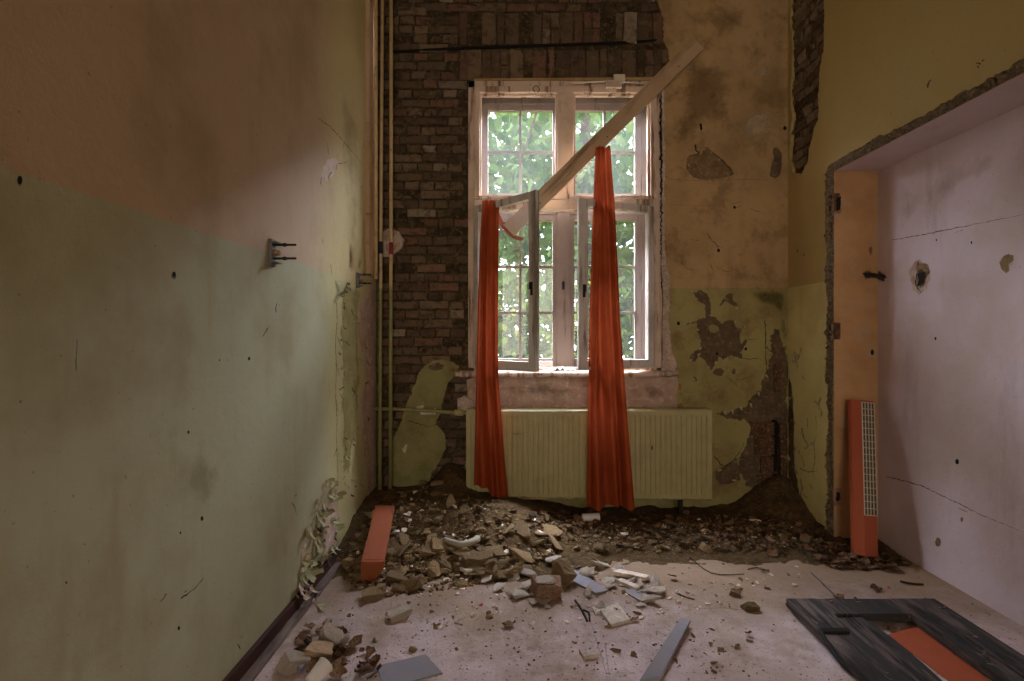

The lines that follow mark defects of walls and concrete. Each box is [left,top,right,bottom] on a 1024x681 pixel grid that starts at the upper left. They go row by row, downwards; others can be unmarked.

flaking render [295,0,669,602]
peeling [624,89,747,408]
spalling [715,329,802,497]
flaking render [770,0,825,178]
spalling [823,59,1024,537]
crack [886,476,1020,531]